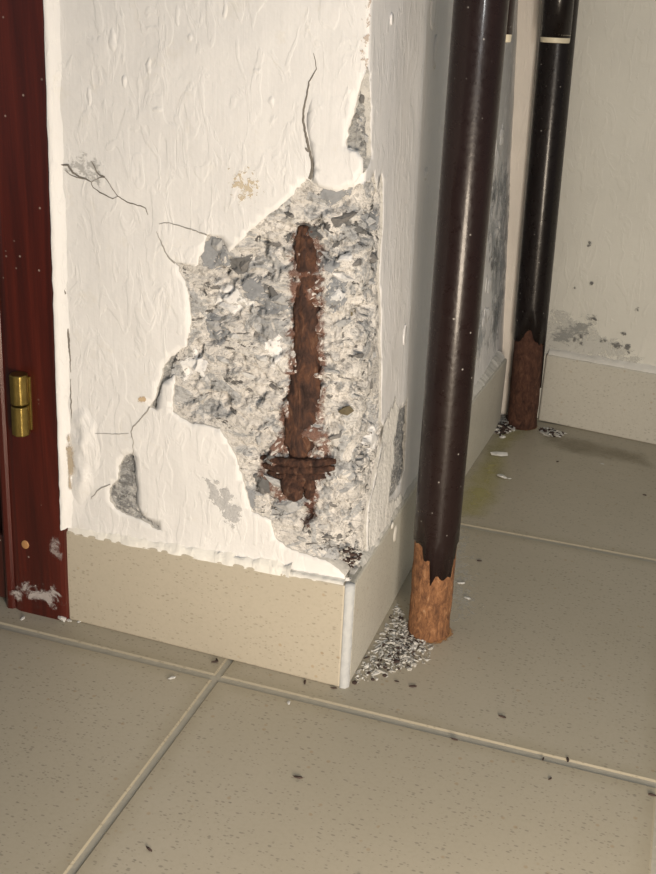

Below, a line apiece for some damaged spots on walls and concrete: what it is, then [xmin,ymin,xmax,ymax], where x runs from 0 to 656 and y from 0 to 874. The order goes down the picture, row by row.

crack [302,53,317,180]
flaking render [347,91,369,166]
crack [61,161,207,264]
damp [477,167,510,352]
flaking render [111,454,160,529]
spalling [152,179,382,569]
rust [259,317,298,503]
rust [288,223,331,459]
rust [304,473,324,528]
flaking render [389,405,405,495]
damp [545,310,638,363]